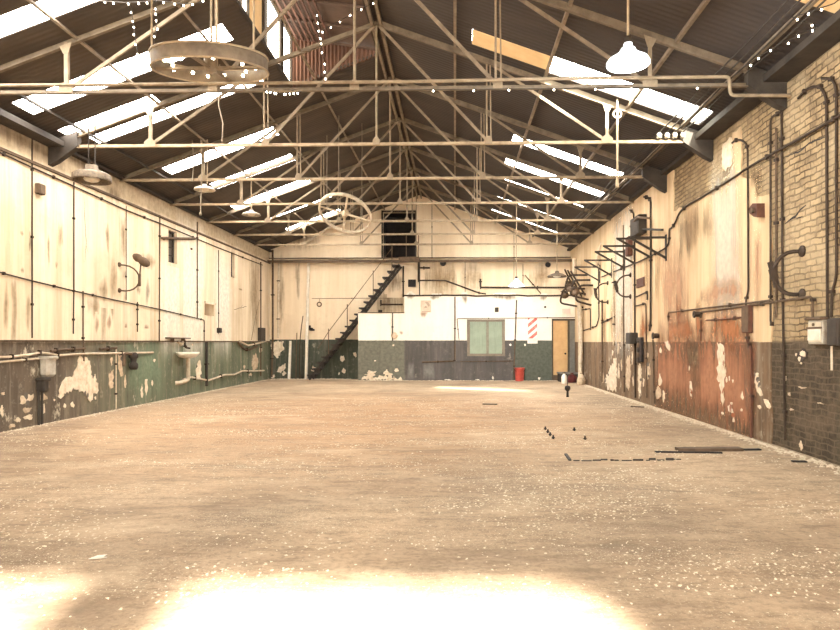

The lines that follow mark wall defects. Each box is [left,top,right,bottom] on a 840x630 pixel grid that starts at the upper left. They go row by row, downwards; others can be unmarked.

leakage [0,124,87,174]
flaking render [722,137,733,171]
leakage [2,266,31,347]
leakage [85,182,129,358]
leakage [238,242,261,365]
peeling [9,352,99,429]
peeling [243,339,286,378]
peeling [362,368,403,380]
flaking render [602,343,665,403]
corrosion [657,268,755,436]
peeling [716,343,744,422]
peeling [754,372,771,409]